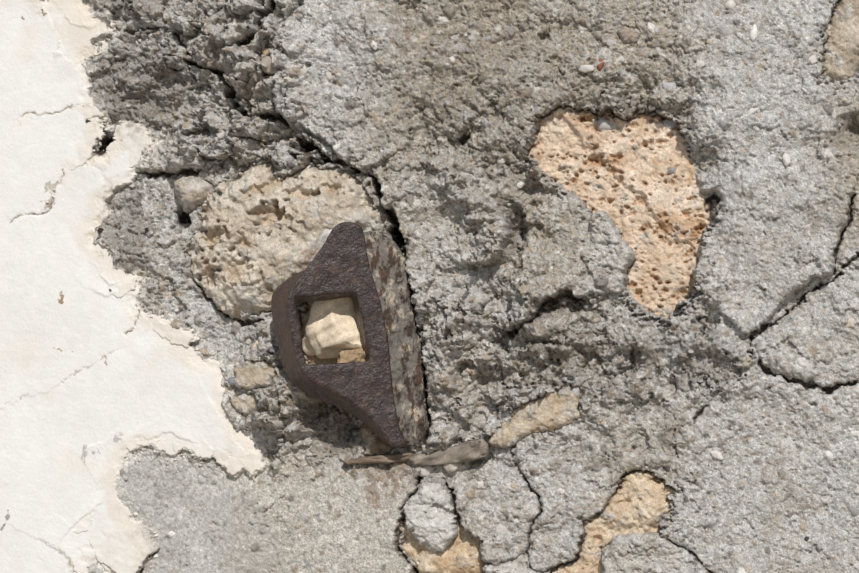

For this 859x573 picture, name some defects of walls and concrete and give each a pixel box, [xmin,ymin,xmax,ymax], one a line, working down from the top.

crack [237,1,276,46]
spalling [66,0,195,171]
crack [109,26,406,253]
flaking render [188,163,386,323]
flaking render [525,97,715,321]
crack [748,195,859,394]
peeling [73,503,158,573]
peeling [167,437,216,463]
peeling [224,452,264,477]
crack [395,476,461,573]
crack [511,452,612,572]
flaking render [551,470,675,573]